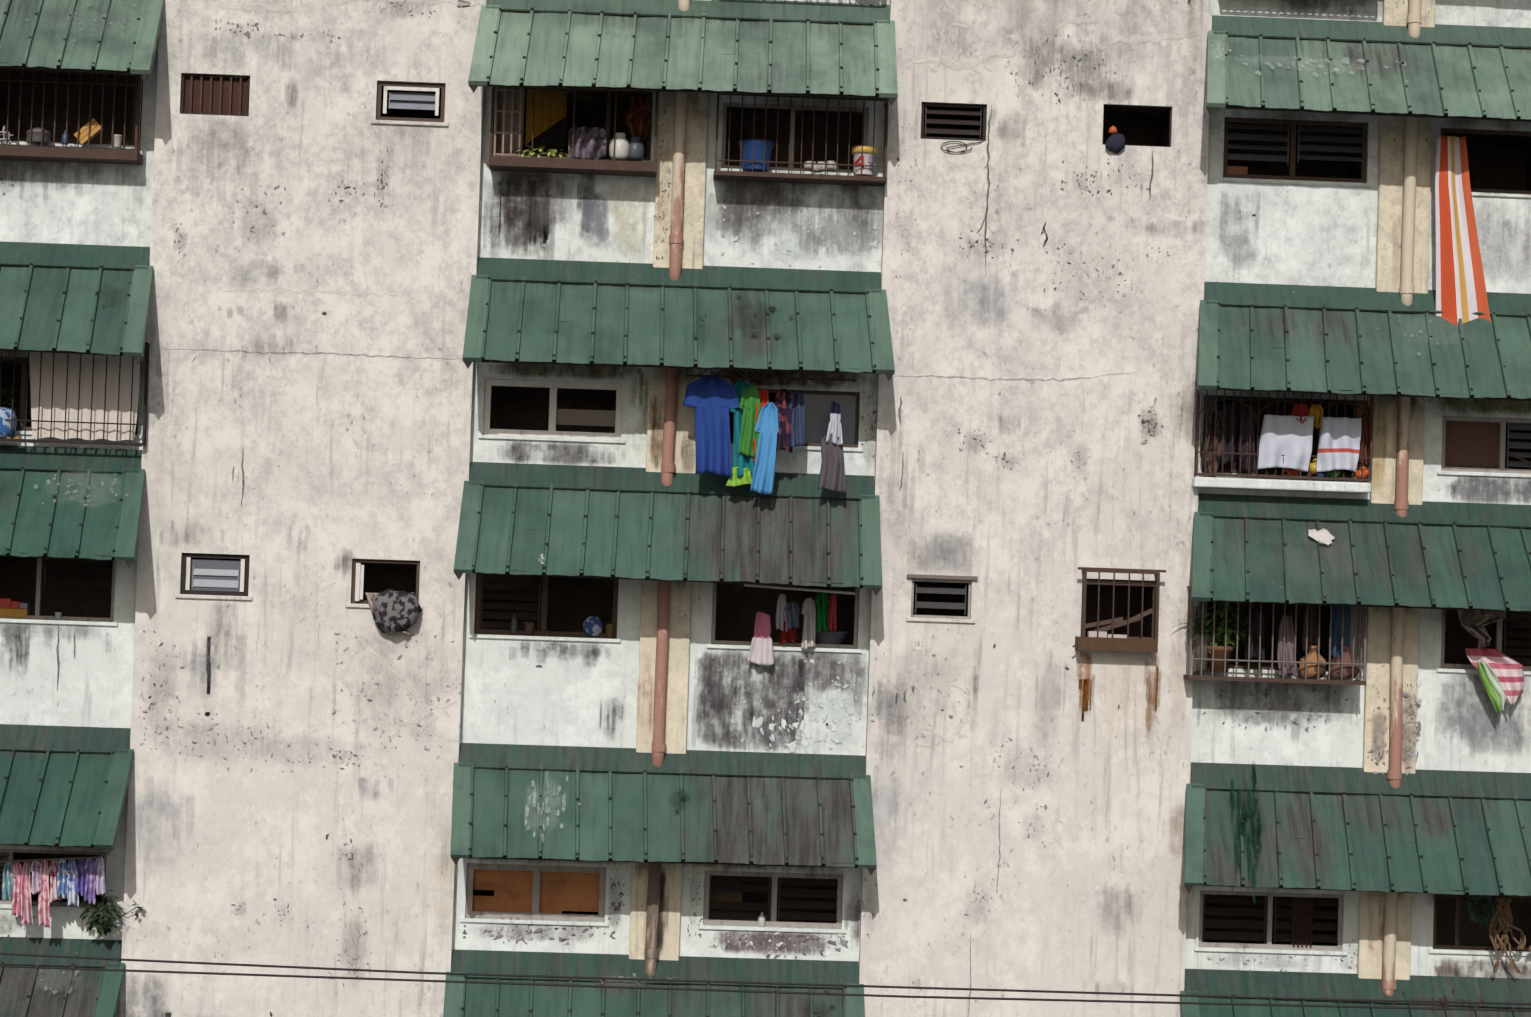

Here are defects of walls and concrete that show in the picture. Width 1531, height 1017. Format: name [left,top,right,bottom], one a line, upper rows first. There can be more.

water stain [500,172,563,252]
water stain [582,175,608,240]
water stain [723,181,804,237]
water stain [805,185,868,249]
crack [977,106,992,276]
water stain [692,651,859,748]